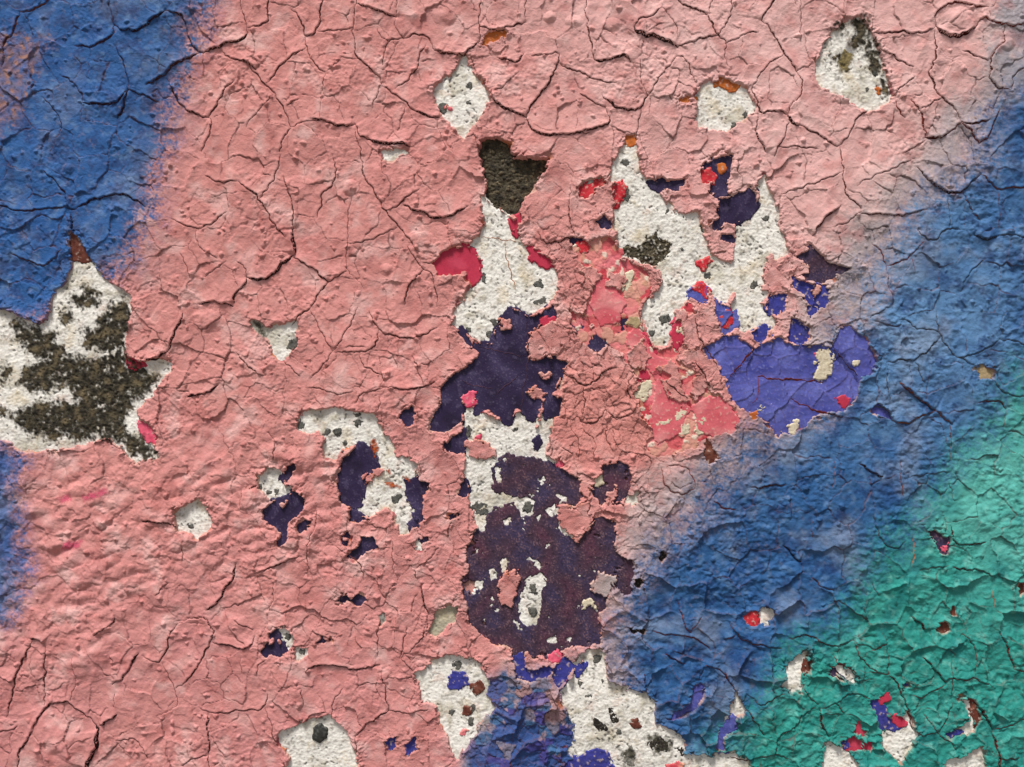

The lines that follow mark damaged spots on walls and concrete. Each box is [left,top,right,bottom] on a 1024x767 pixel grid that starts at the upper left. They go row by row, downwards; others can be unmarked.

peeling [815,16,891,112]
crack [0,0,1024,500]
peeling [0,233,173,463]
crack [2,511,317,767]
peeling [297,406,429,561]
crack [300,541,439,753]
peeling [414,655,496,759]
peeling [429,135,877,767]
crack [751,484,813,537]
crack [655,600,1024,767]
peeling [821,692,918,767]
crack [873,514,1024,672]